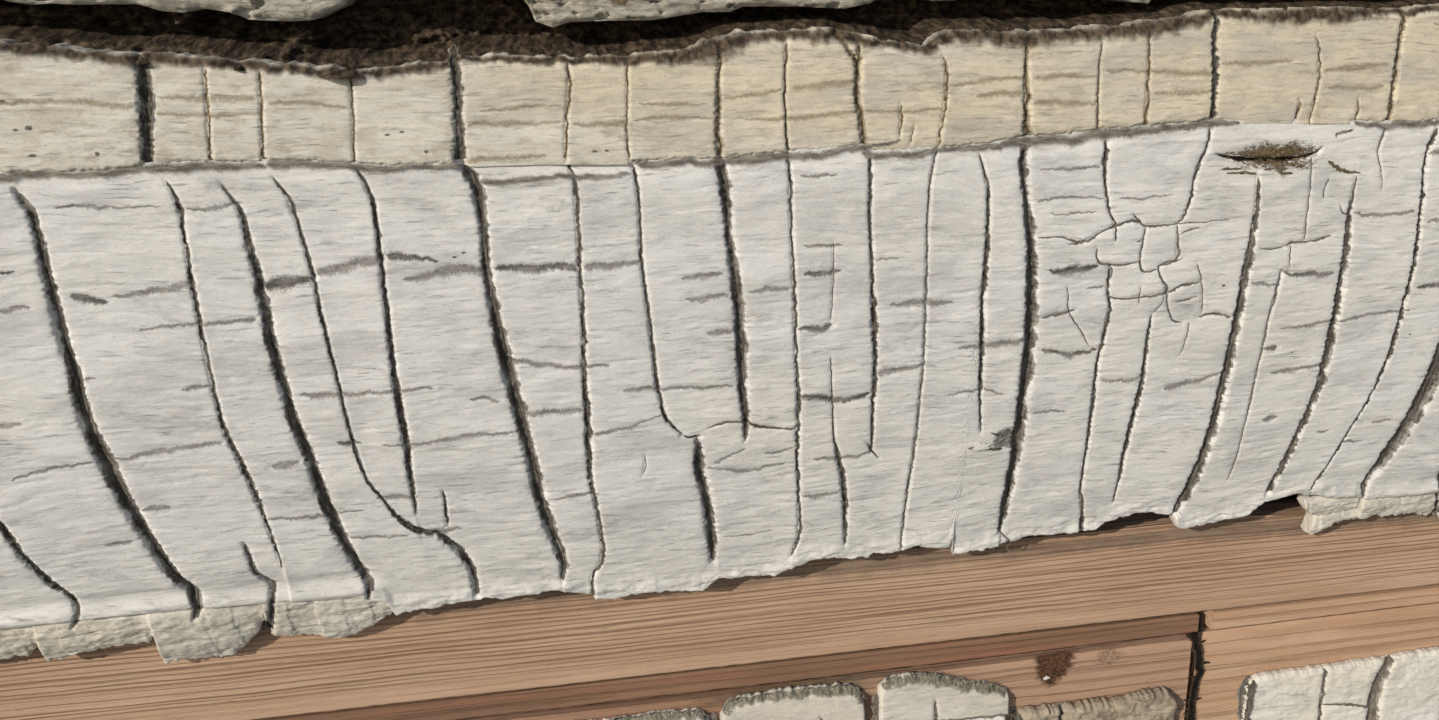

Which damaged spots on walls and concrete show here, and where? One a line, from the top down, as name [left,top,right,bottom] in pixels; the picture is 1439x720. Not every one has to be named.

crack [1267,16,1439,497]
crack [0,11,1334,629]
peeling [1297,492,1439,535]
crack [1431,473,1439,515]
peeling [0,597,393,664]
peeling [572,671,1009,720]
crack [871,695,879,720]
crack [934,701,1024,720]
crack [1057,703,1065,720]
crack [1177,614,1210,720]
crack [1317,655,1394,720]